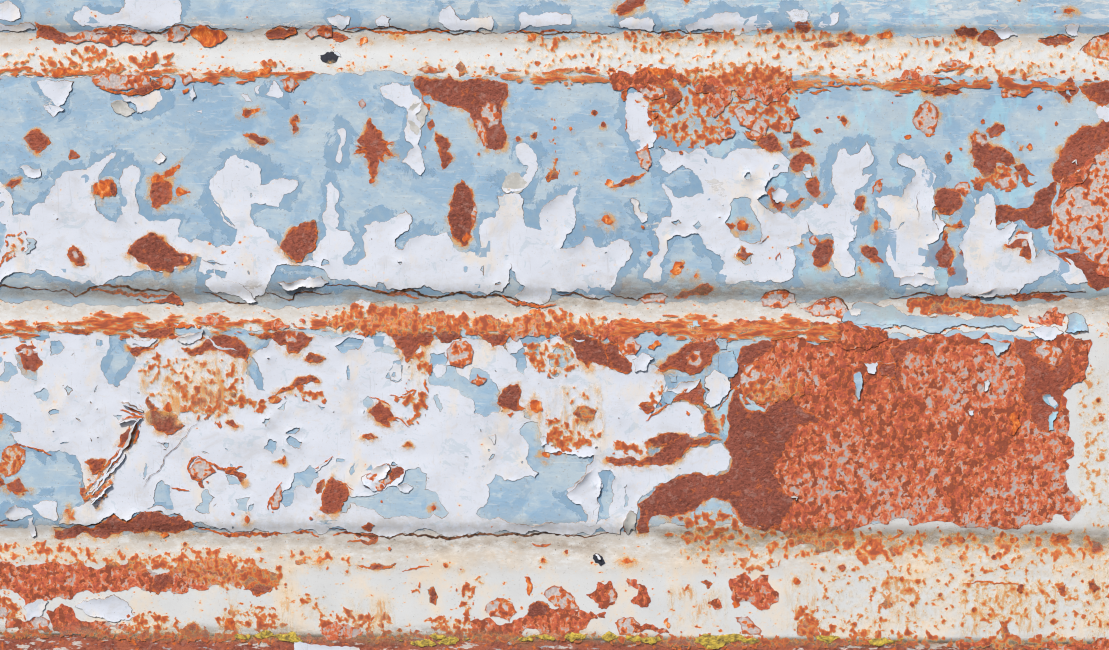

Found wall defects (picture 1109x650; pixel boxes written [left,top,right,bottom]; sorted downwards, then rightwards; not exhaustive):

peeling [0,0,243,47]
corrosion [611,0,645,16]
corrosion [0,45,314,101]
peeling [241,74,299,109]
corrosion [412,21,1109,291]
peeling [0,79,1089,356]
corrosion [127,232,196,276]
peeling [0,328,732,551]
corrosion [0,294,1109,650]